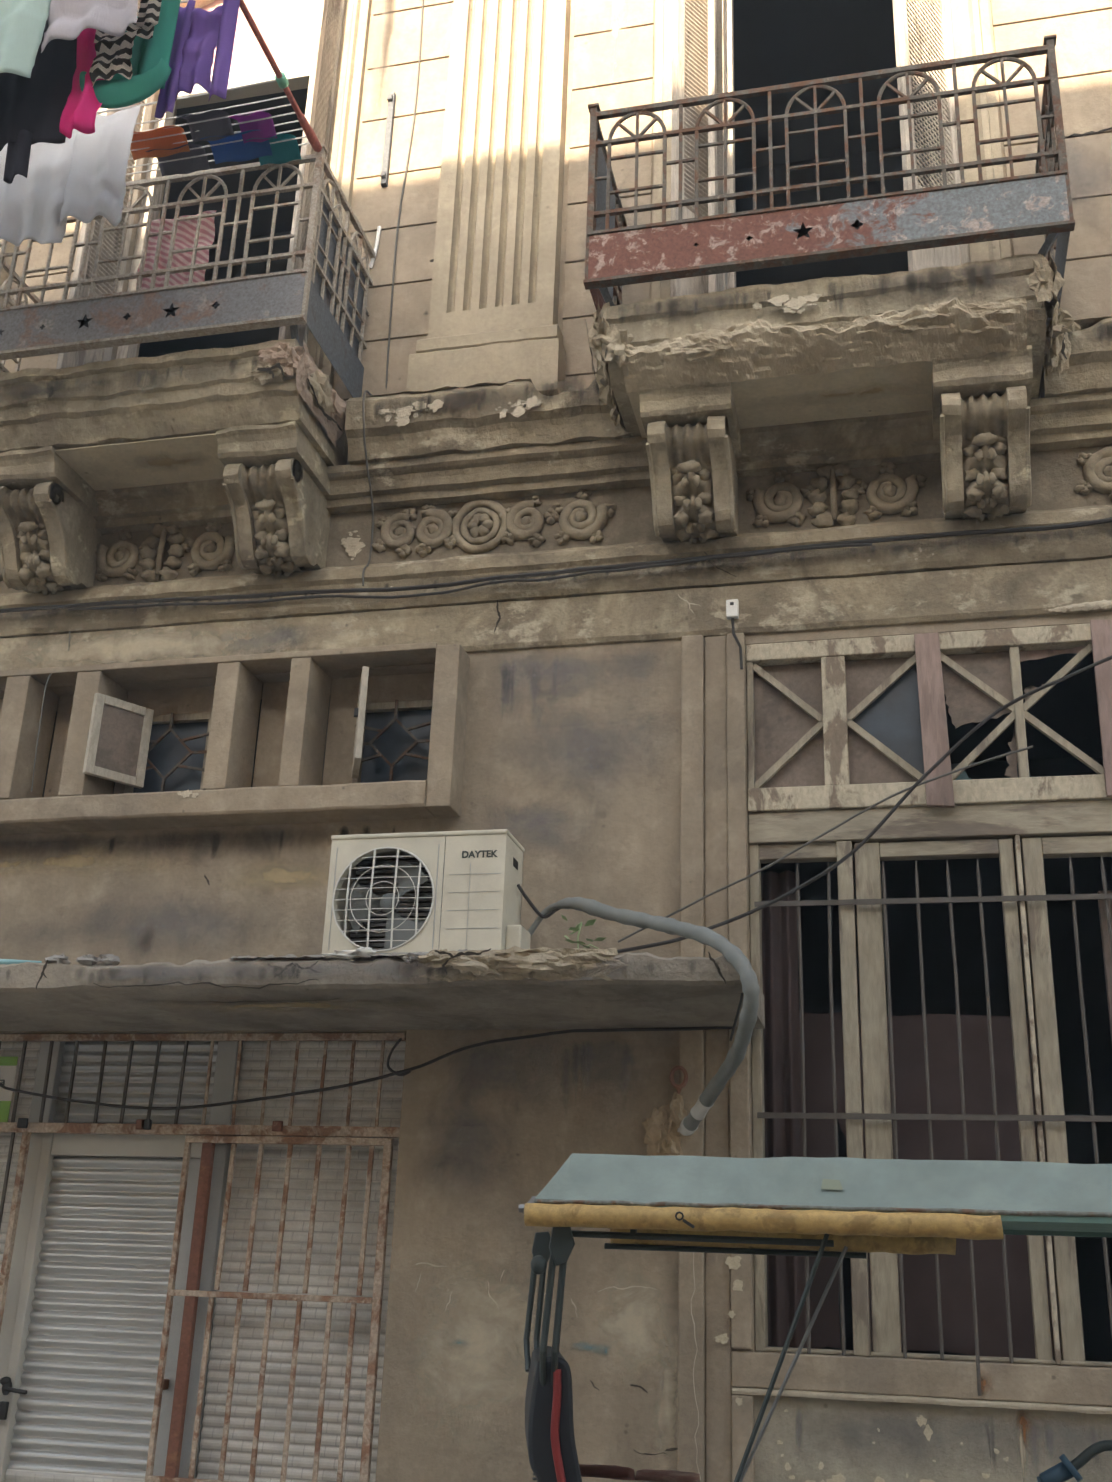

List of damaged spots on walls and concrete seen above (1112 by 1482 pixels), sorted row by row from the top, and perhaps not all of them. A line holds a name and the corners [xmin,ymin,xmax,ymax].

spalling [588,250,1112,438]
spalling [250,339,346,447]
peeling [367,379,543,427]
crack [36,960,48,989]
crack [93,961,338,1003]
spalling [229,945,628,982]
crack [435,948,491,974]
peeling [916,1415,933,1441]